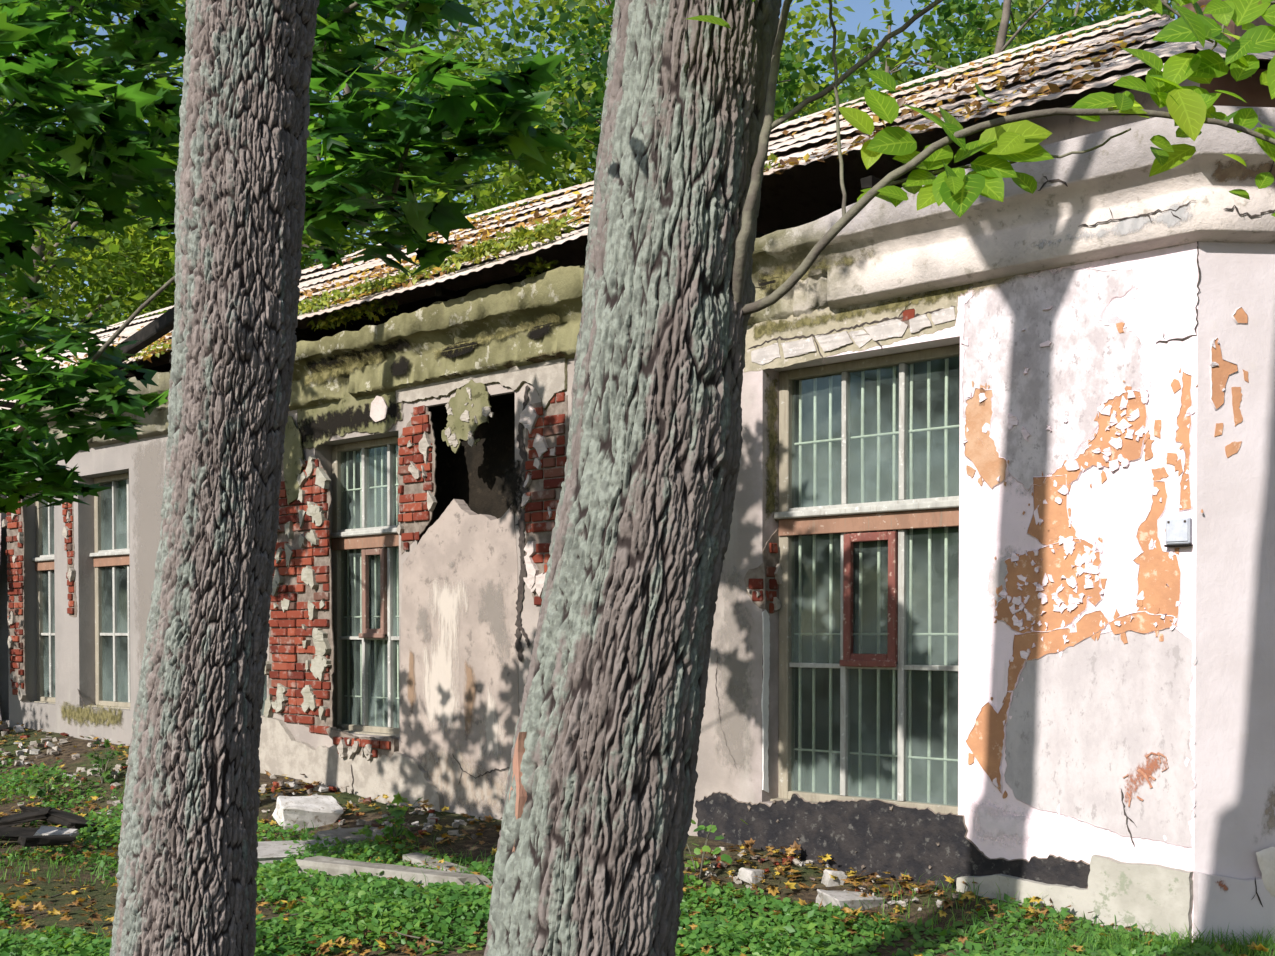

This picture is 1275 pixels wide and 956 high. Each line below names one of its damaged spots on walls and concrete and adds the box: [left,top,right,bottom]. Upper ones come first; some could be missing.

crack [1224,205,1275,218]
crack [1078,201,1201,343]
leakage [304,351,385,387]
leakage [299,400,400,445]
leakage [435,314,560,360]
leakage [496,350,564,368]
spalling [2,499,26,701]
spalling [62,499,77,617]
spalling [263,338,569,761]
peeling [744,266,1249,848]
spalling [695,529,1090,889]